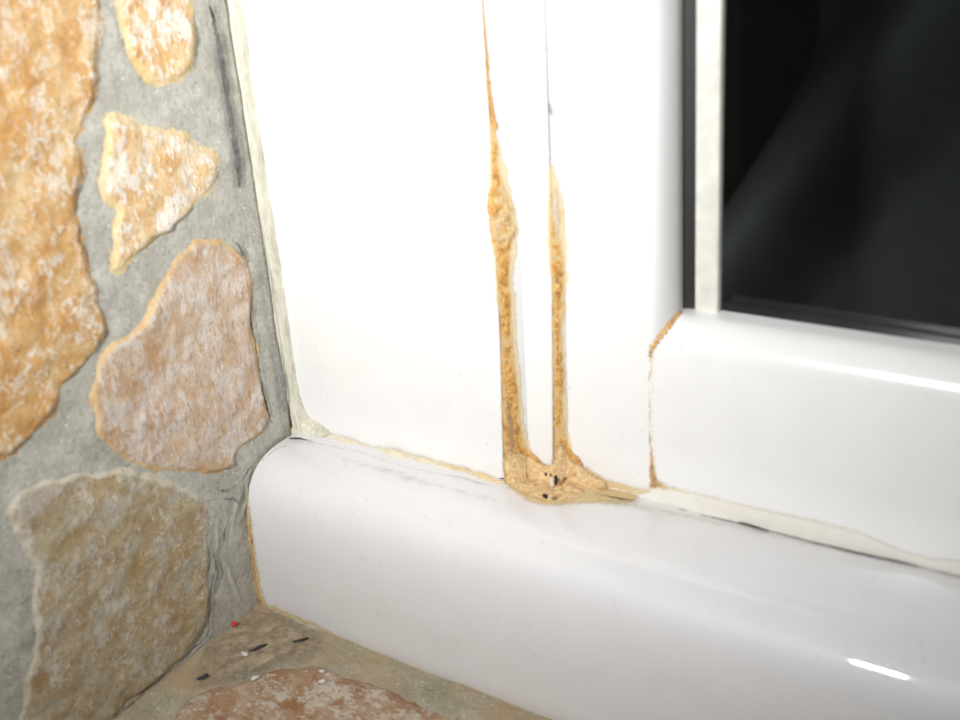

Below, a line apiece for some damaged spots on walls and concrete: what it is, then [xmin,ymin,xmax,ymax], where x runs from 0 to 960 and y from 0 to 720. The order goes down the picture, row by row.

corrosion [481,0,637,504]
corrosion [649,311,683,377]
corrosion [649,436,666,490]